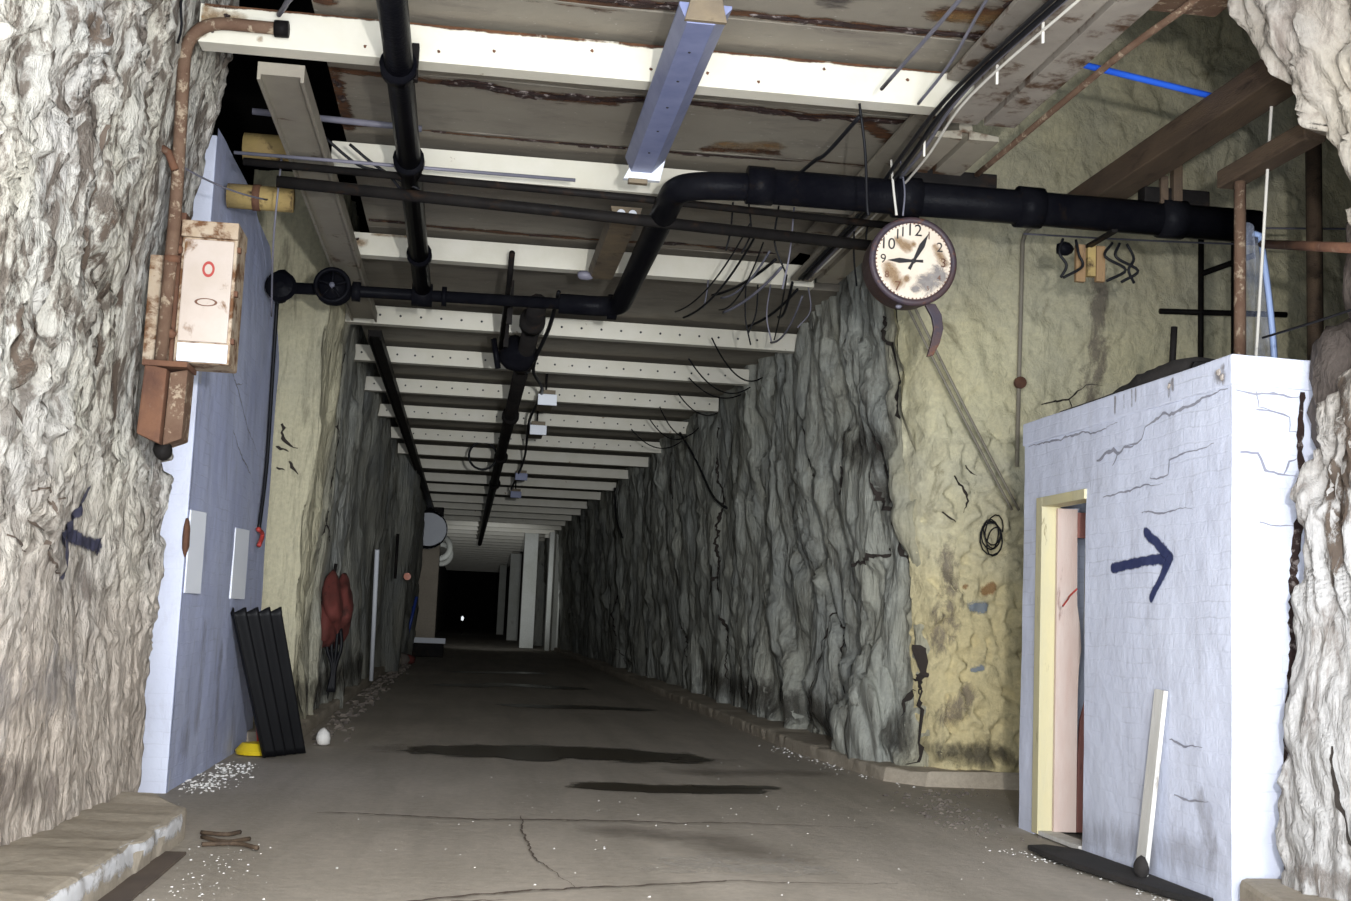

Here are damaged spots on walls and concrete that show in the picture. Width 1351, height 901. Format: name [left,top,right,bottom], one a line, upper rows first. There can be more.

rust [555,0,679,12]
rust [730,0,1013,42]
crack [1029,384,1306,514]
crack [1259,519,1303,703]
crack [1169,738,1202,748]
crack [1281,738,1289,764]
crack [317,812,894,901]